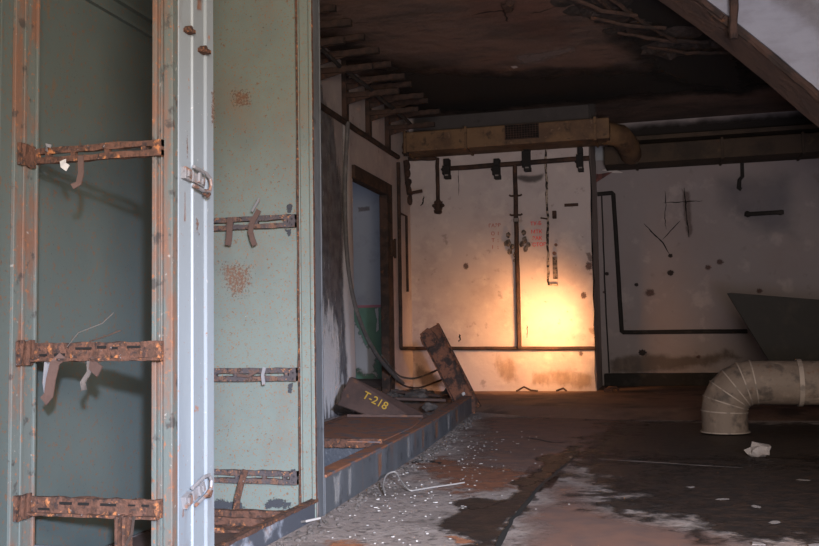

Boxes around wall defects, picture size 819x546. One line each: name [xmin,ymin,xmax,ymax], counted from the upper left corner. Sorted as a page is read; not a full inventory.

water stain [438,417,819,546]